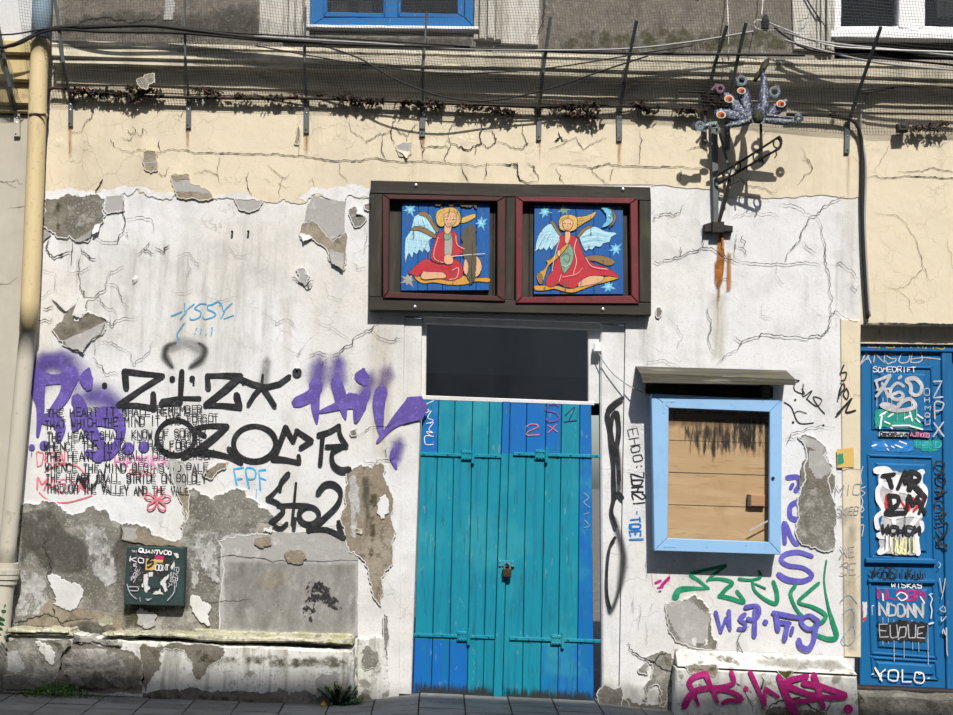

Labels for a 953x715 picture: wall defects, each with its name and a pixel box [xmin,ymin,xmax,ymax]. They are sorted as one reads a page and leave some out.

water stain [62,0,258,46]
peeling [42,193,125,242]
peeling [170,173,214,201]
peeling [299,196,371,272]
crack [111,117,953,365]
rust [715,234,731,298]
peeling [52,294,108,354]
peeling [794,434,838,552]
peeling [1,459,340,706]
peeling [340,462,397,671]
peeling [664,593,719,651]
peeling [596,650,719,710]